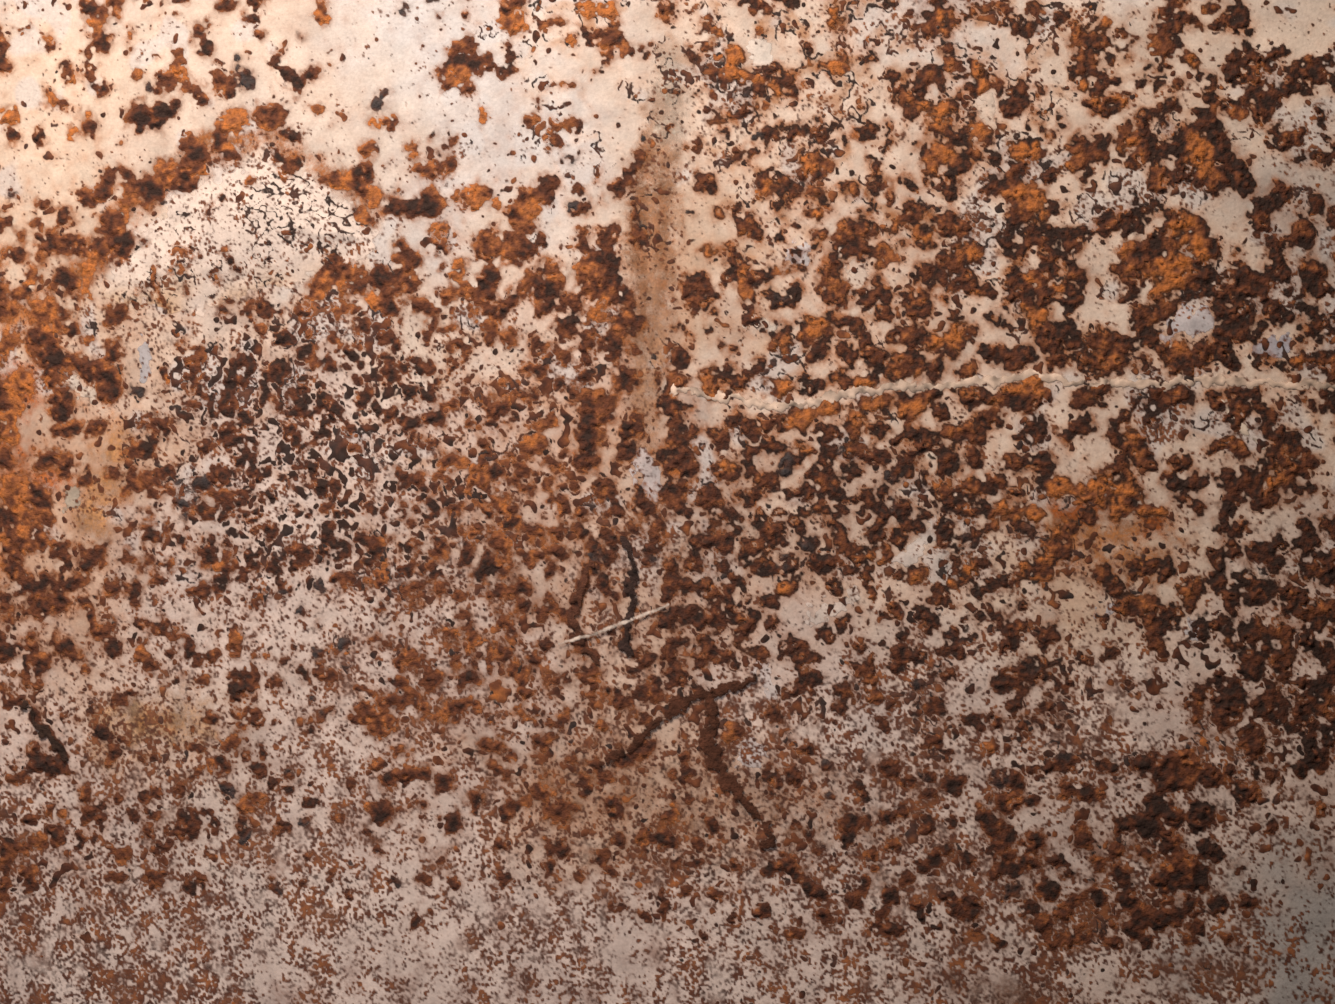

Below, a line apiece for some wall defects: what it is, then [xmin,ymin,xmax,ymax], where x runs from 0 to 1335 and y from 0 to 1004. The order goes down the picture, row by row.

rust [0,27,13,76]
rust [0,74,102,159]
rust [18,0,125,98]
rust [122,18,256,135]
rust [214,0,265,40]
rust [267,44,326,115]
rust [313,0,332,25]
rust [372,0,439,17]
rust [478,102,491,124]
rust [411,0,566,98]
rust [521,97,602,183]
rust [0,210,13,234]